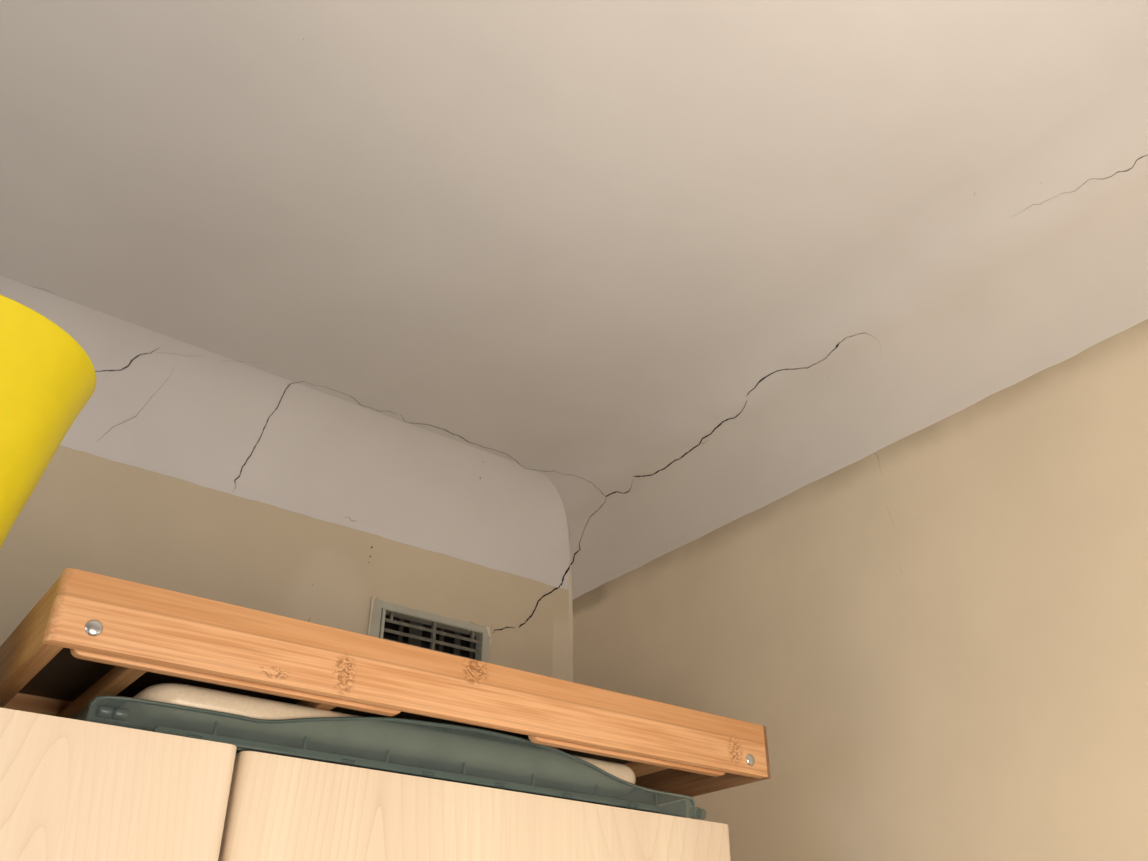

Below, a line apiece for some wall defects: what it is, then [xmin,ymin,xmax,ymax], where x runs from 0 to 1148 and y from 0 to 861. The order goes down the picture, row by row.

crack [95,353,149,372]
crack [234,381,304,484]
crack [493,333,863,633]